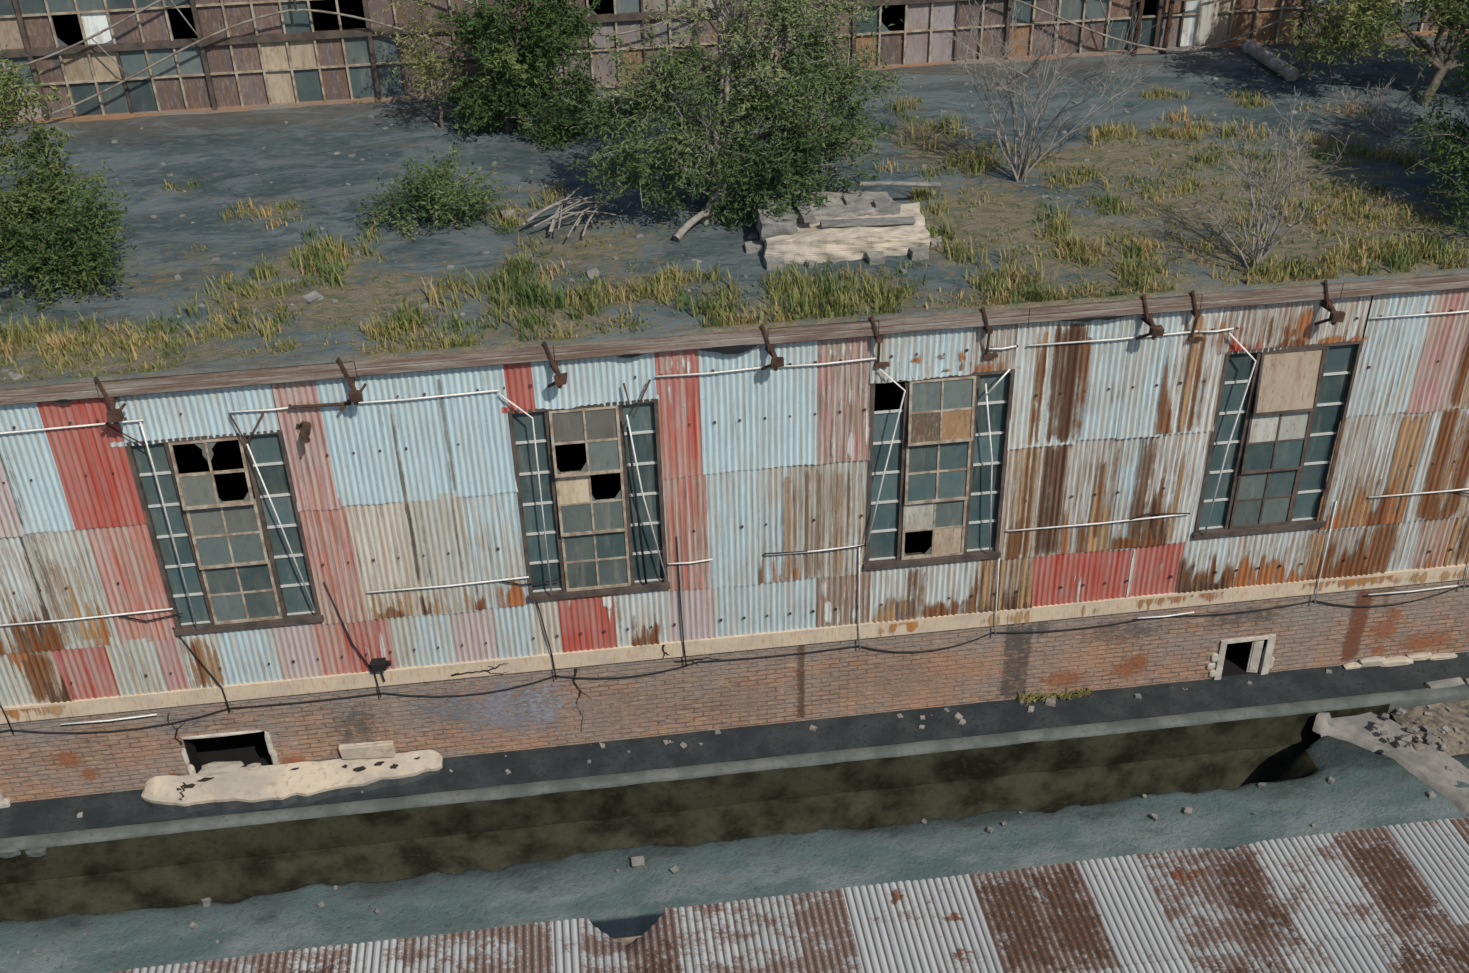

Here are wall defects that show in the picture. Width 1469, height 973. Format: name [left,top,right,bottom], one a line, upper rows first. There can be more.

rust [878,315,1274,635]
rust [1137,338,1469,662]
rust [0,559,111,724]
rust [182,638,223,687]
crack [572,668,592,732]
rust [631,938,679,973]
rust [975,864,1115,972]
rust [1167,852,1306,973]
rust [1337,837,1469,973]